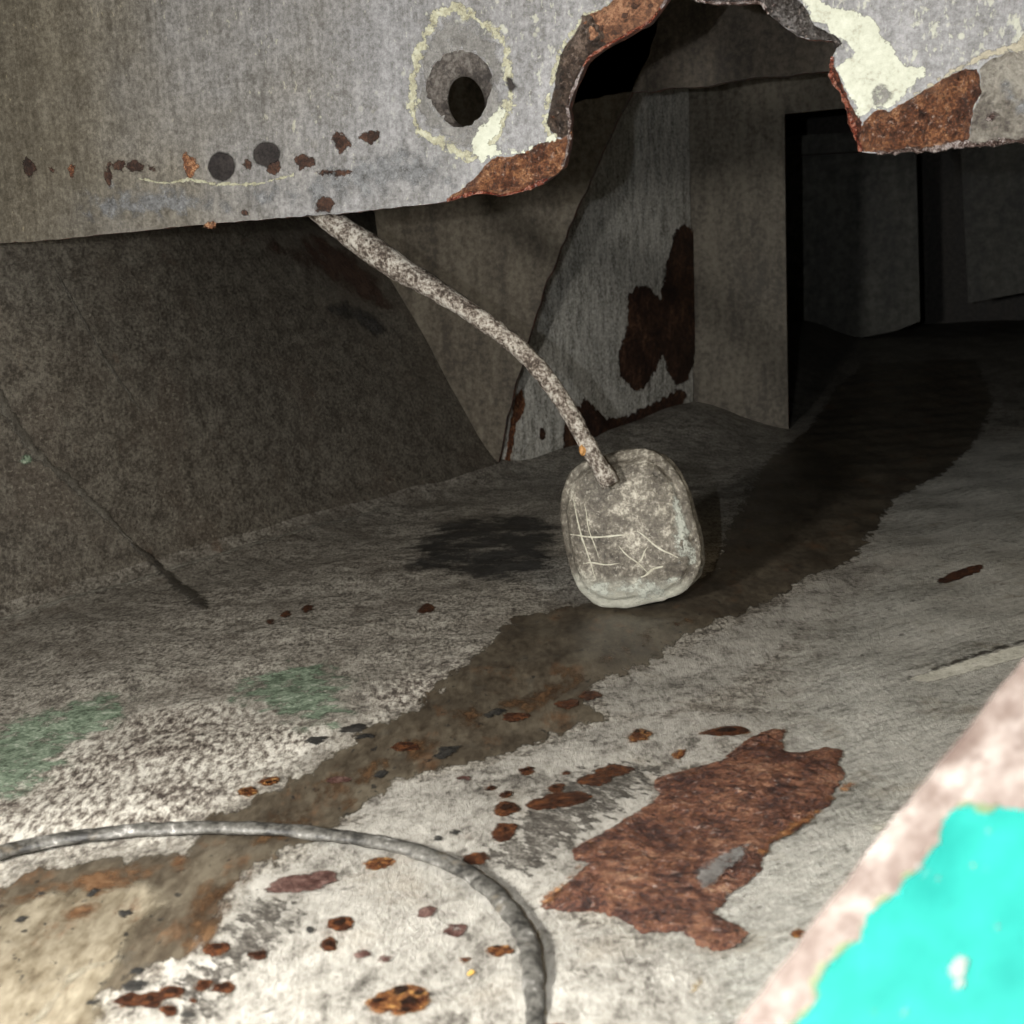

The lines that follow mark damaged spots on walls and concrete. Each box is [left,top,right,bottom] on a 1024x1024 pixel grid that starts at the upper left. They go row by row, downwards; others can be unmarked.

peeling [471,3,610,163]
peeling [803,0,1024,118]
rust [563,424,577,448]
rust [577,223,695,438]
damp [0,359,995,1024]
rust [540,726,855,952]